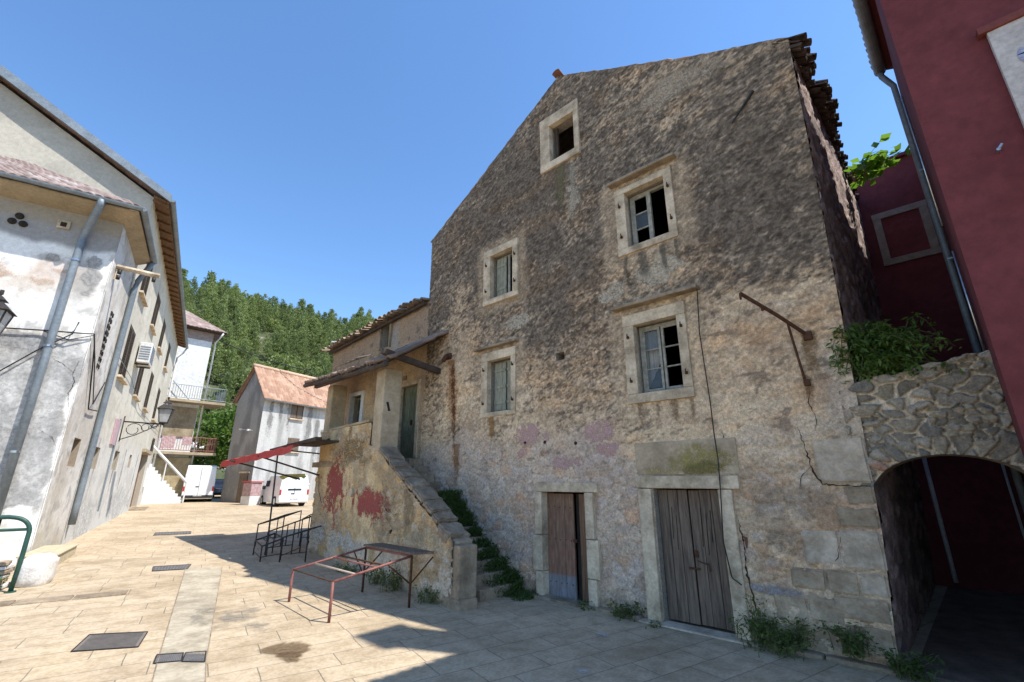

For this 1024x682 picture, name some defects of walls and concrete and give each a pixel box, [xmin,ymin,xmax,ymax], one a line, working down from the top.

crack [797,389,868,487]
crack [738,520,756,611]